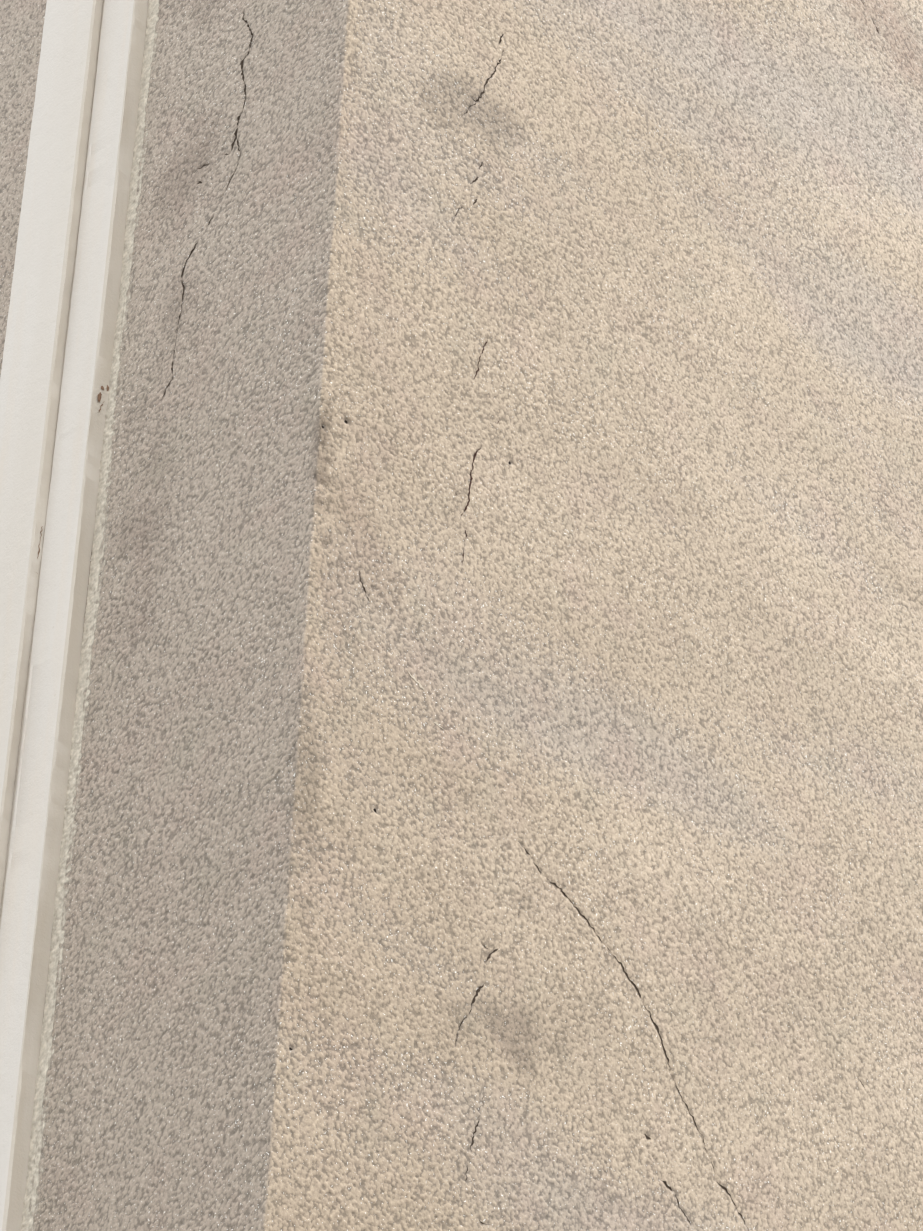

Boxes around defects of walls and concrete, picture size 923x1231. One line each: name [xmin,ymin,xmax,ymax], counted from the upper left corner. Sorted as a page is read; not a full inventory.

crack [462,34,504,116]
crack [455,448,481,565]
crack [456,944,498,1041]
crack [519,842,748,1228]
crack [466,1089,484,1180]